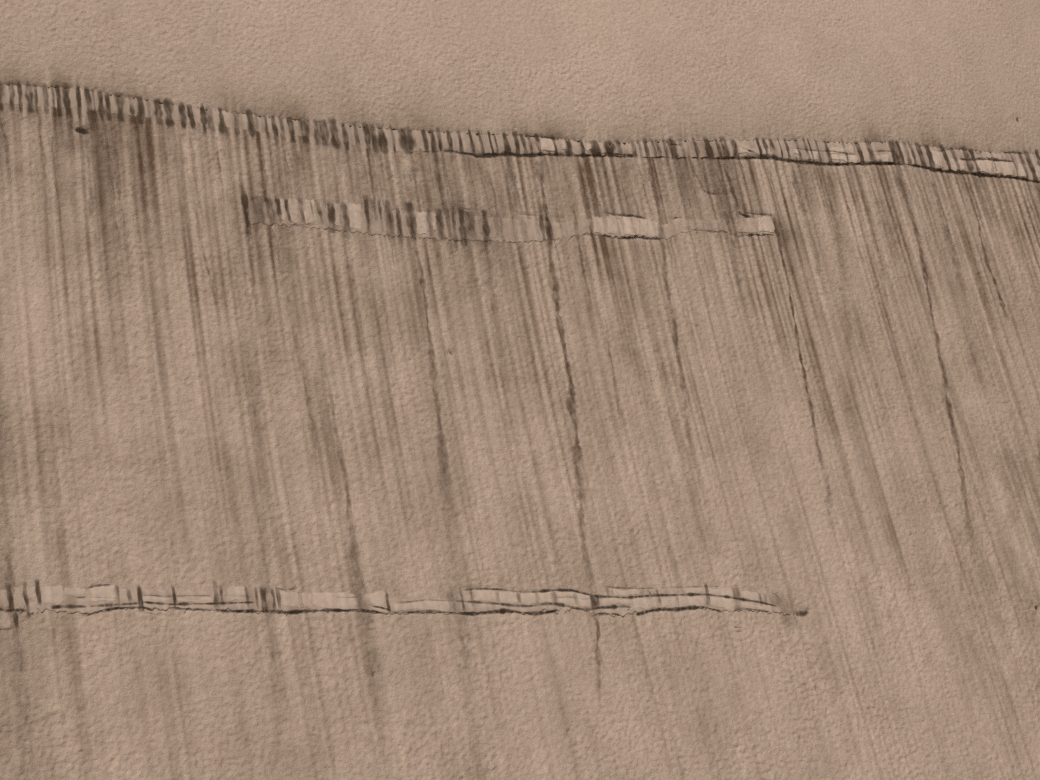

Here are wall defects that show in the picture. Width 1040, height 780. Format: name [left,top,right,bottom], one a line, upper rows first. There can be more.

damp [53,86,542,155]
crack [445,137,633,157]
damp [552,137,619,157]
damp [694,139,738,159]
crack [713,148,1035,182]
damp [318,206,347,222]
damp [364,200,414,236]
damp [436,208,489,243]
crack [612,213,660,239]
damp [553,284,579,449]
damp [9,581,41,625]
crack [52,584,775,615]